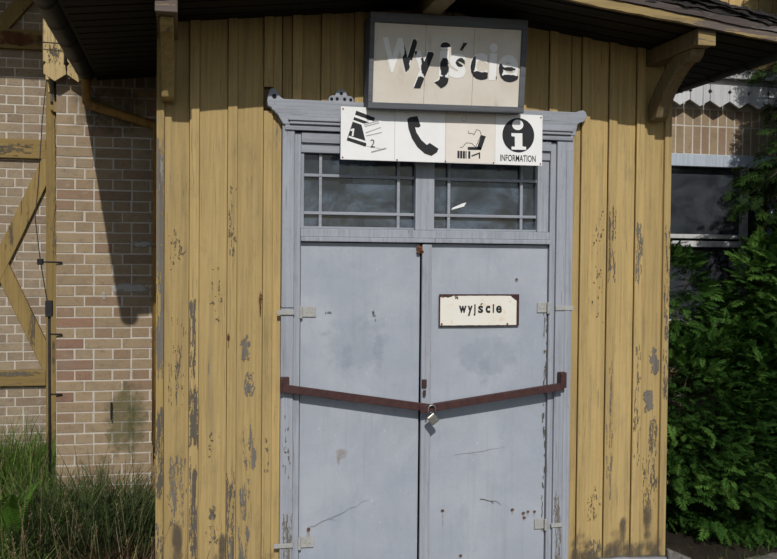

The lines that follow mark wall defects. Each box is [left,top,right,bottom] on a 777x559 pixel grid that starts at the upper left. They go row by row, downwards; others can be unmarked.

peeling [592,206,616,304]
peeling [155,137,269,559]
peeling [633,222,671,511]
peeling [588,367,613,521]
peeling [282,514,292,559]